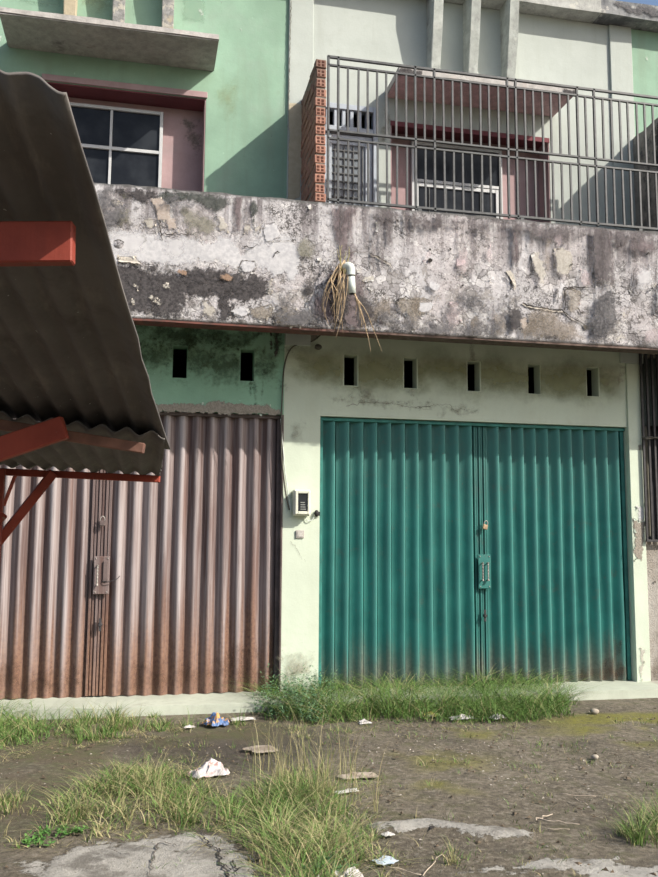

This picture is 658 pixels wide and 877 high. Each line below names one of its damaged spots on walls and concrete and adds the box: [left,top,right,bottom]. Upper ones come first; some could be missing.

damp [640,125,658,203]
peeling [143,197,179,234]
peeling [243,222,281,242]
spalling [117,255,143,266]
peeling [239,260,256,274]
damp [97,184,583,357]
damp [367,209,658,344]
spalling [530,248,582,312]
peeling [633,505,645,561]
crack [149,832,250,877]